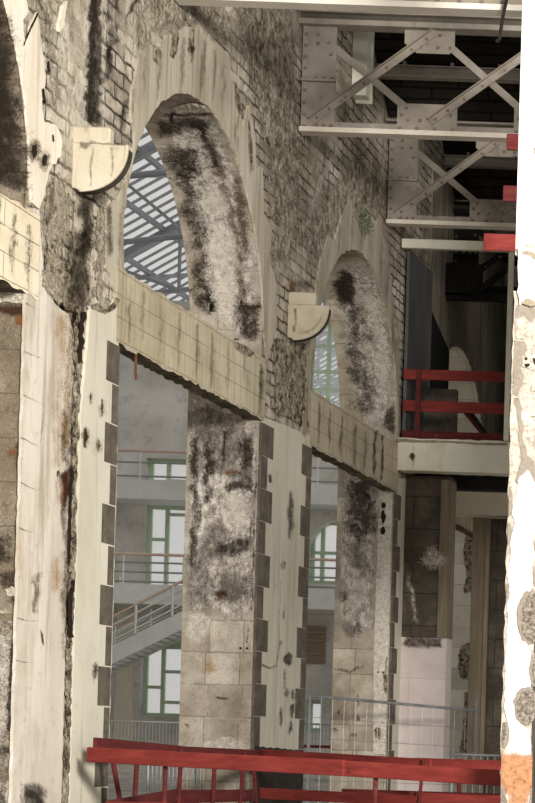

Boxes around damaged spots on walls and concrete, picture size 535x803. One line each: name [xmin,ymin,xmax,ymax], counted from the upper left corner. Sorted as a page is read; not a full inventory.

crack [61,300,87,803]
damp [187,408,256,566]
damp [345,475,377,545]
damp [365,414,384,478]
spalling [517,570,535,645]
damp [0,621,13,803]
spalling [502,653,535,748]
rust [501,754,533,803]